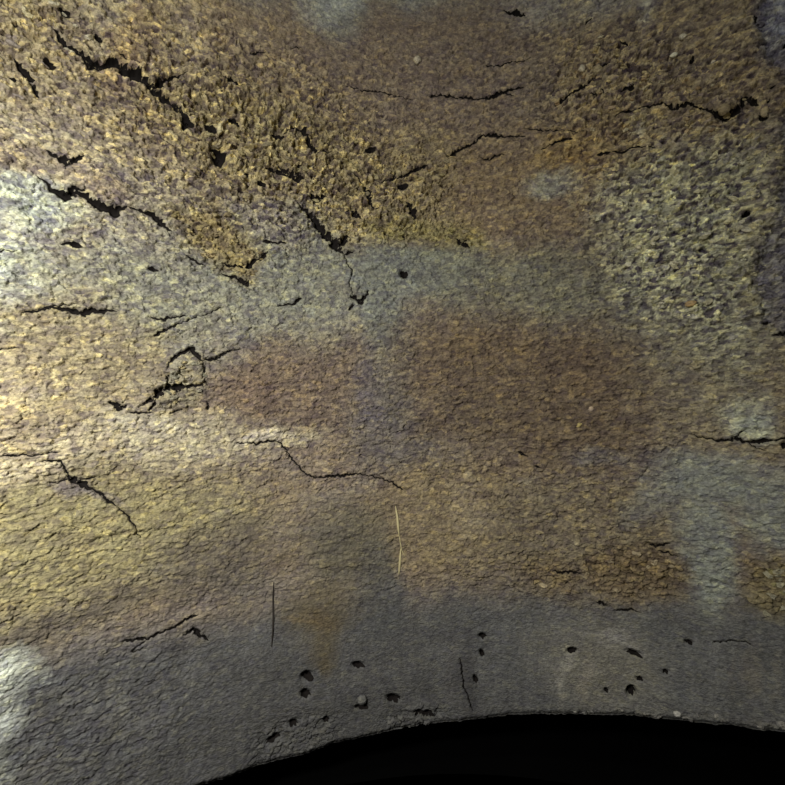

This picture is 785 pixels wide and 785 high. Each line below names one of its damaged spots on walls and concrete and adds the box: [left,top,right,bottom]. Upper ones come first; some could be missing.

crack [51,27,190,131]
crack [555,61,776,123]
crack [37,149,172,231]
crack [245,127,369,310]
crack [346,165,428,220]
crack [151,307,222,336]
crack [109,347,240,414]
crack [0,452,141,538]
crack [236,440,403,490]
crack [692,430,785,450]
spalling [242,671,344,771]
spalling [355,694,467,732]